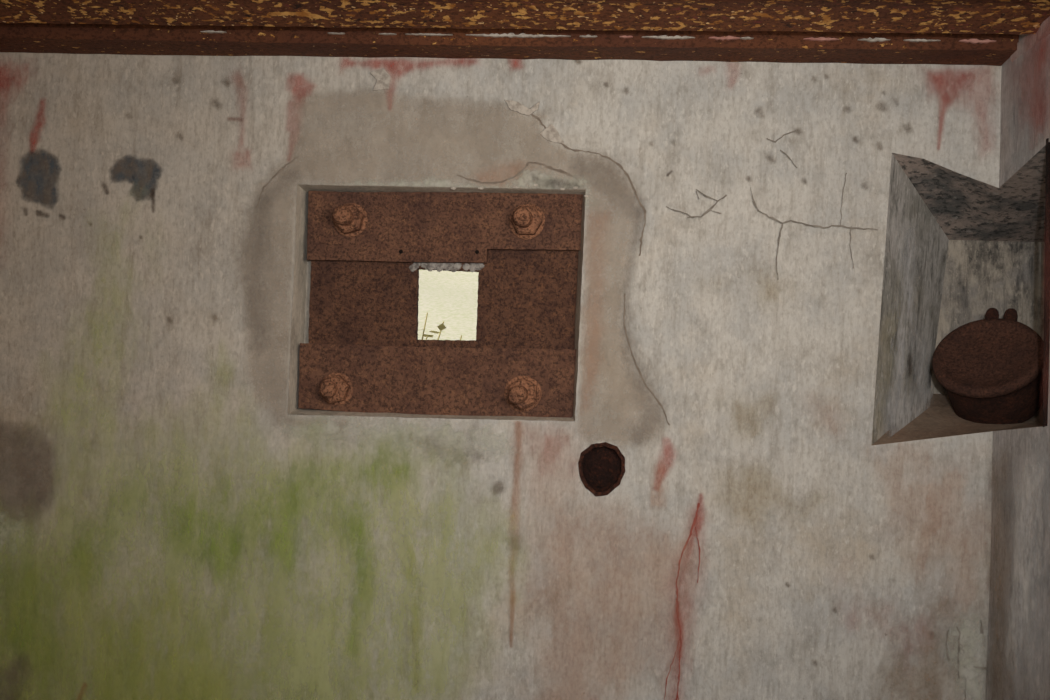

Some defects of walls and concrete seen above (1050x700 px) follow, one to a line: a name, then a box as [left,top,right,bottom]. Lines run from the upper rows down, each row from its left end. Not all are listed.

crack [767,130,797,168]
crack [666,173,878,276]